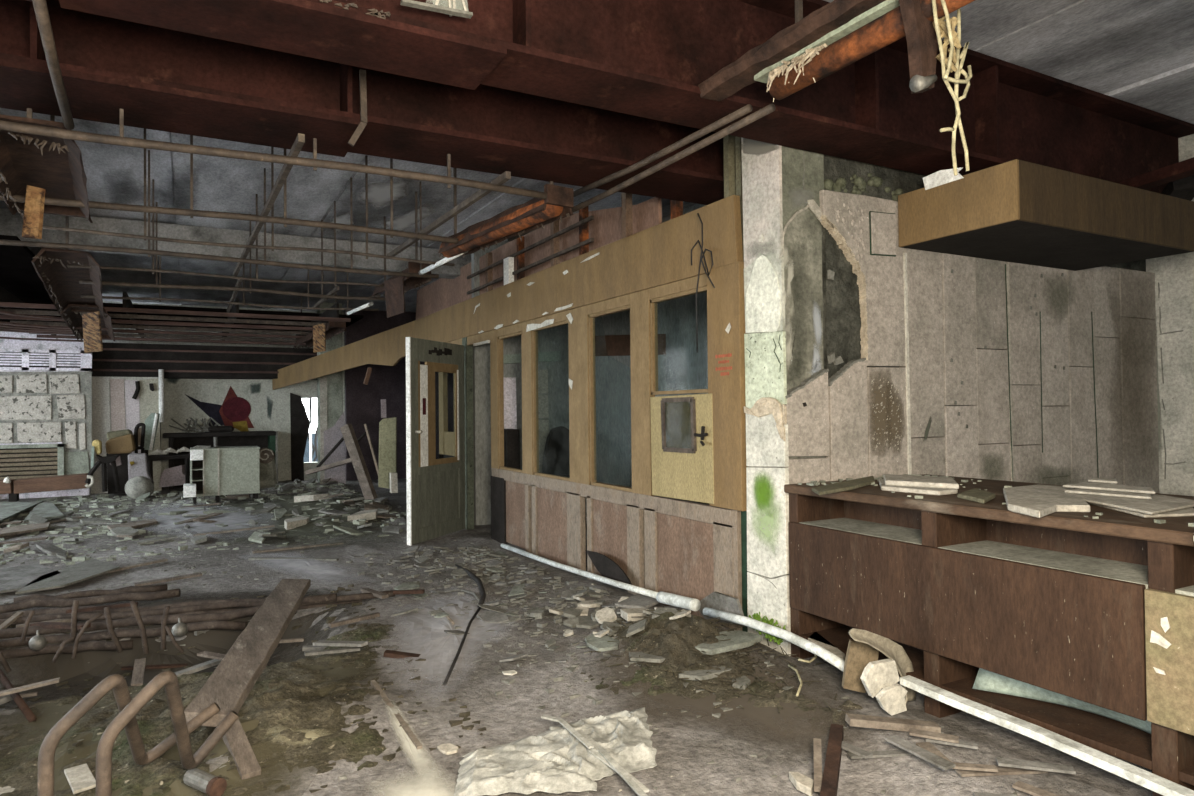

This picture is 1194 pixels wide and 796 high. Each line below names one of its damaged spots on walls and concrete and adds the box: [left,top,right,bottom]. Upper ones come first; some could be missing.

peeling [478,303,573,334]
flaking render [744,146,868,441]
leakage [871,377,904,452]